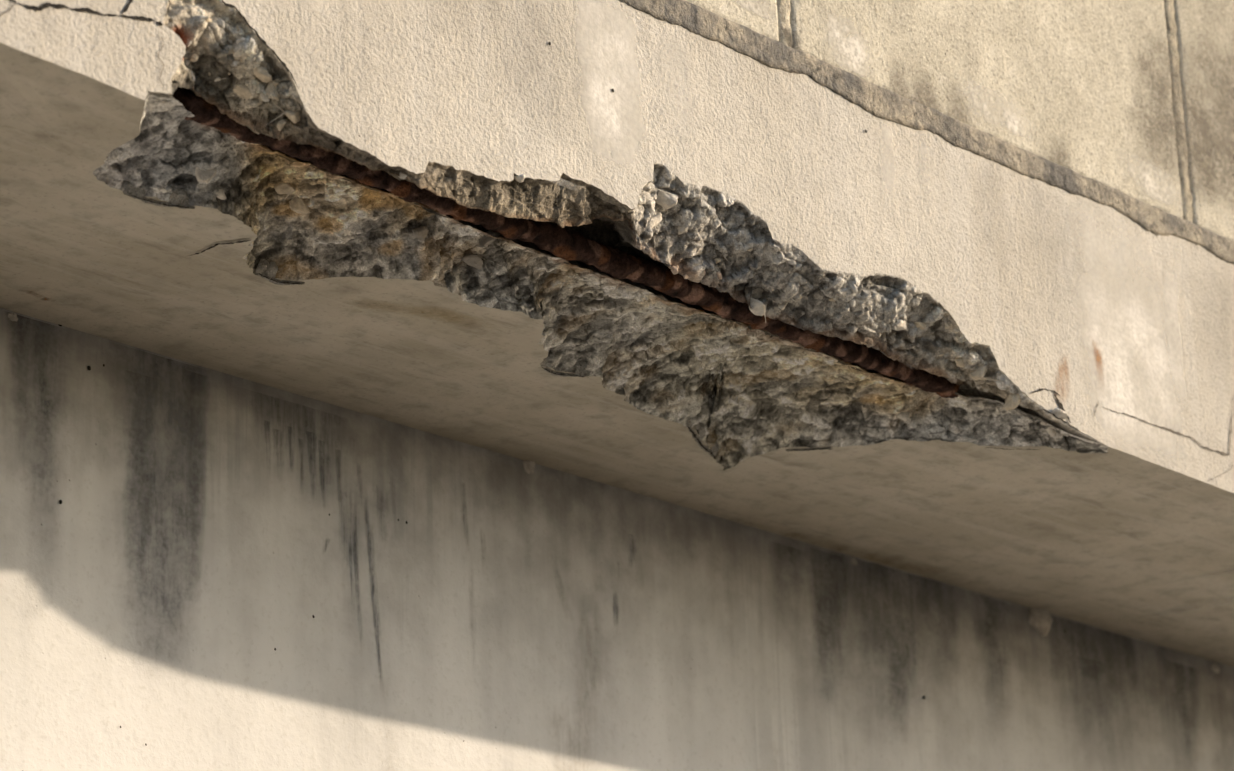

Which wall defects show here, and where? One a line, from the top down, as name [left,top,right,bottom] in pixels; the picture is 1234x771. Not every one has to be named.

crack [0,0,171,90]
crack [222,0,299,89]
spalling [93,0,1108,471]
efflorescence [1082,281,1184,449]
crack [1032,388,1233,481]